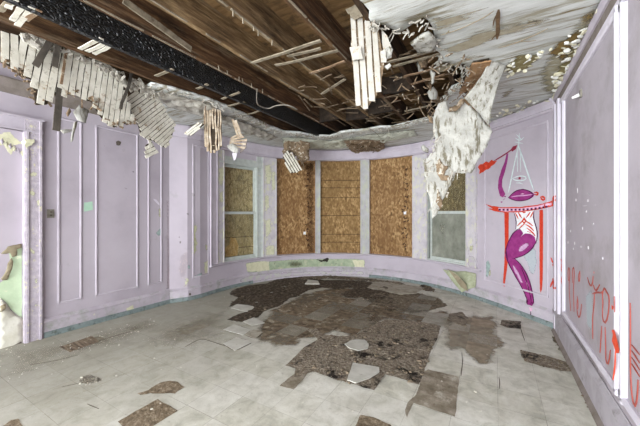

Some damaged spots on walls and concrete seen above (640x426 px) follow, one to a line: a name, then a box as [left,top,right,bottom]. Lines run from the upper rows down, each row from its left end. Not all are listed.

spalling [0,59,36,104]
spalling [367,15,435,70]
spalling [417,38,470,101]
peeling [489,27,588,123]
peeling [60,96,102,142]
spalling [146,83,433,160]
peeling [0,244,35,349]
peeling [228,245,447,322]
peeling [60,336,99,352]
peeling [280,319,459,417]
peeling [520,350,571,372]
peeling [118,381,184,426]